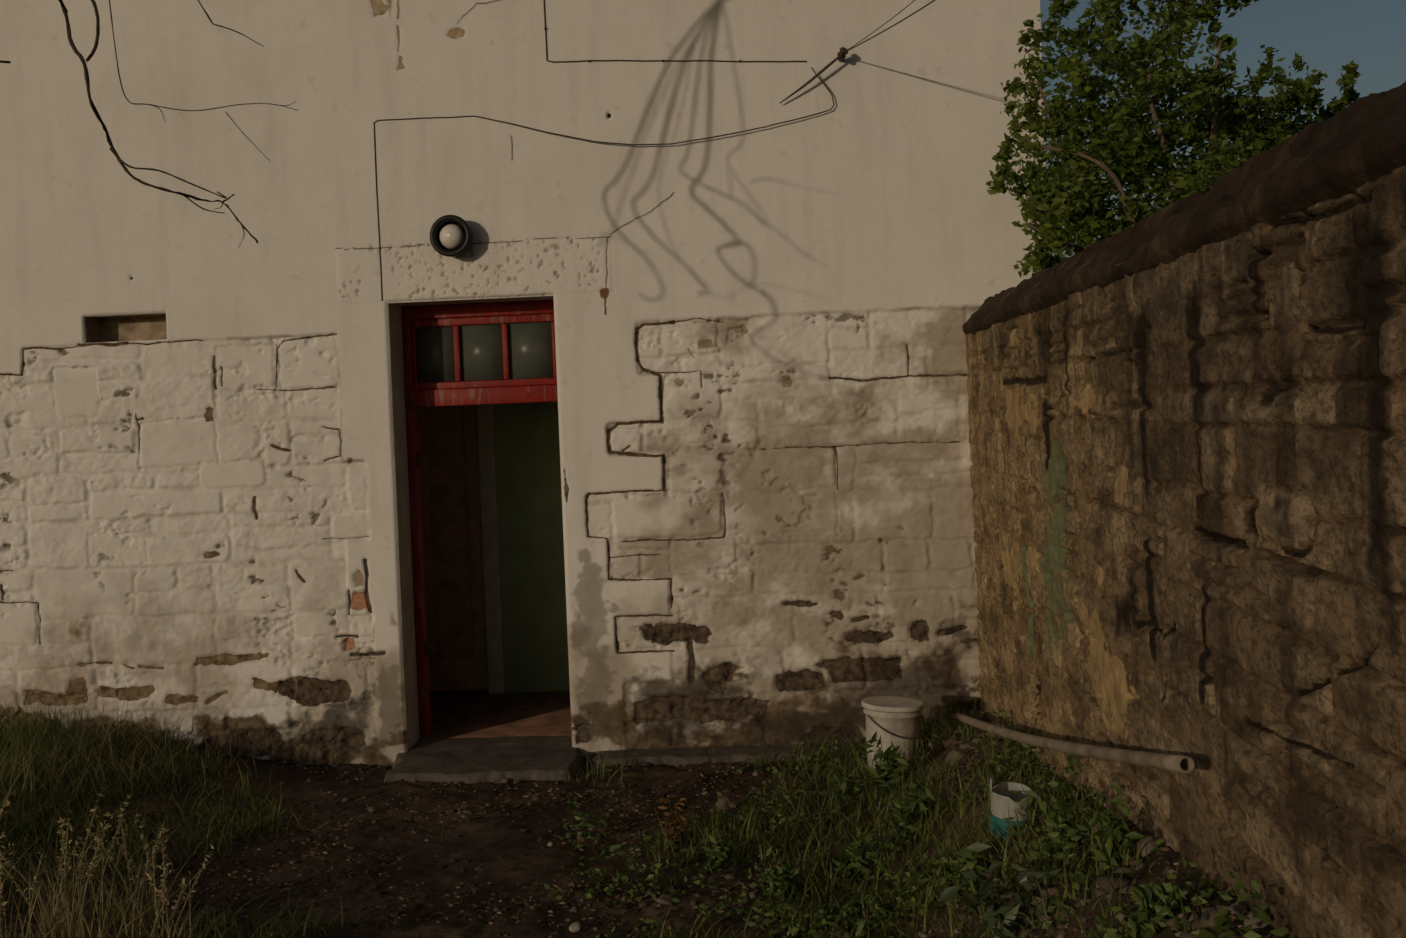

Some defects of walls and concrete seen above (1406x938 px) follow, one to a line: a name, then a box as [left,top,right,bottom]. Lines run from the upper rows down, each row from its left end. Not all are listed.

peeling [687,339,713,358]
peeling [204,406,213,422]
spalling [347,559,372,615]
spalling [0,660,228,749]
spalling [194,652,352,707]
spalling [336,635,386,656]
spalling [634,600,902,724]
water stain [643,631,968,747]
spalling [910,620,967,642]